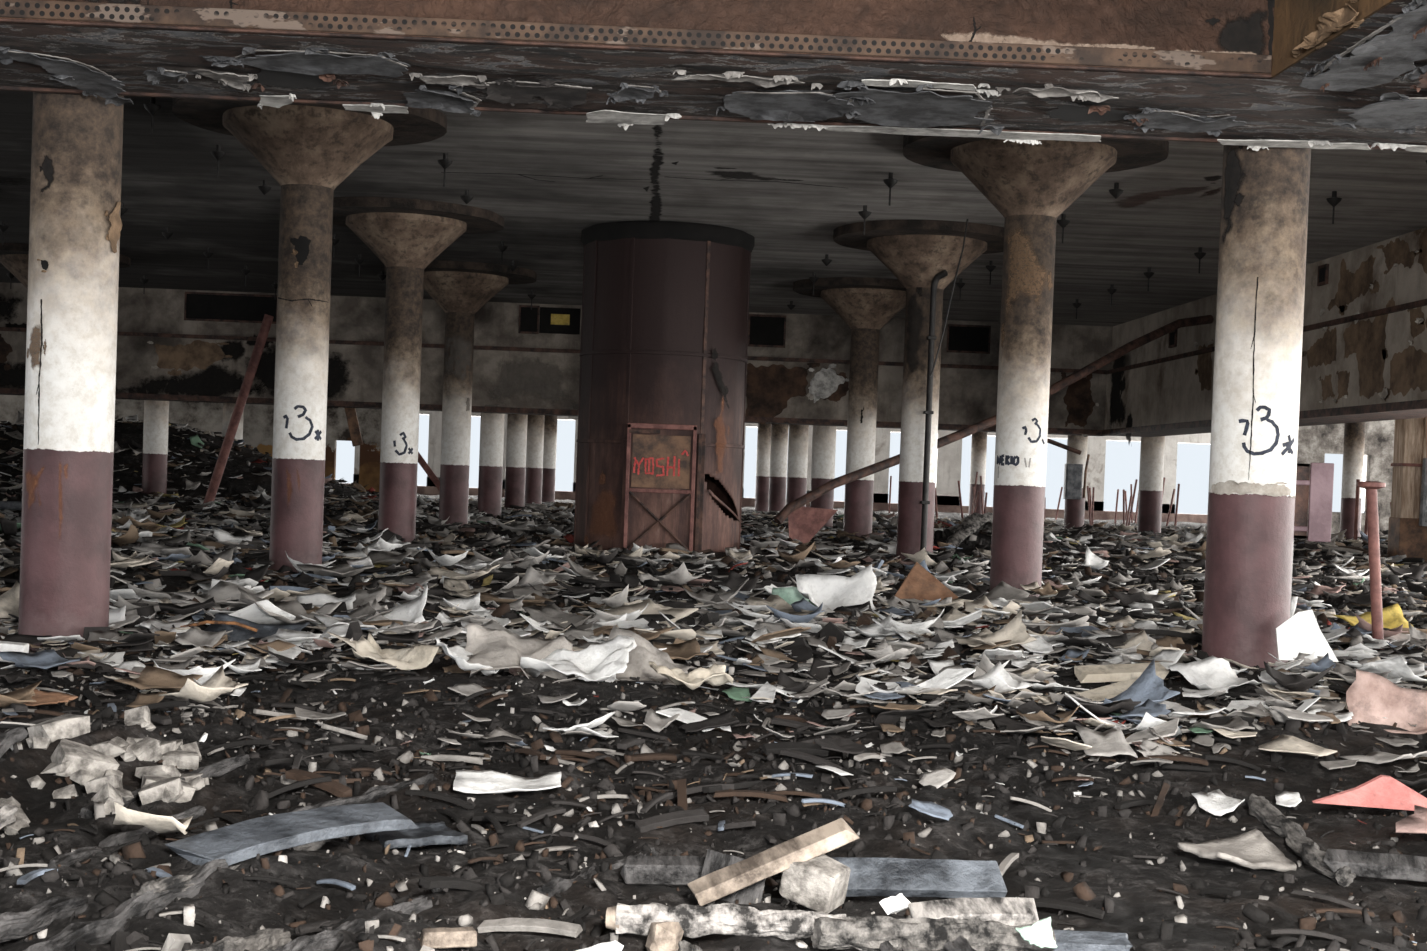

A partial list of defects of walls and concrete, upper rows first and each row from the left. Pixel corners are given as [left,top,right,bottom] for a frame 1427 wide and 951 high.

peeling [0,46,133,106]
peeling [143,0,1427,153]
peeling [1302,227,1427,404]
peeling [0,334,13,371]
peeling [745,363,849,424]
rust [715,399,729,471]